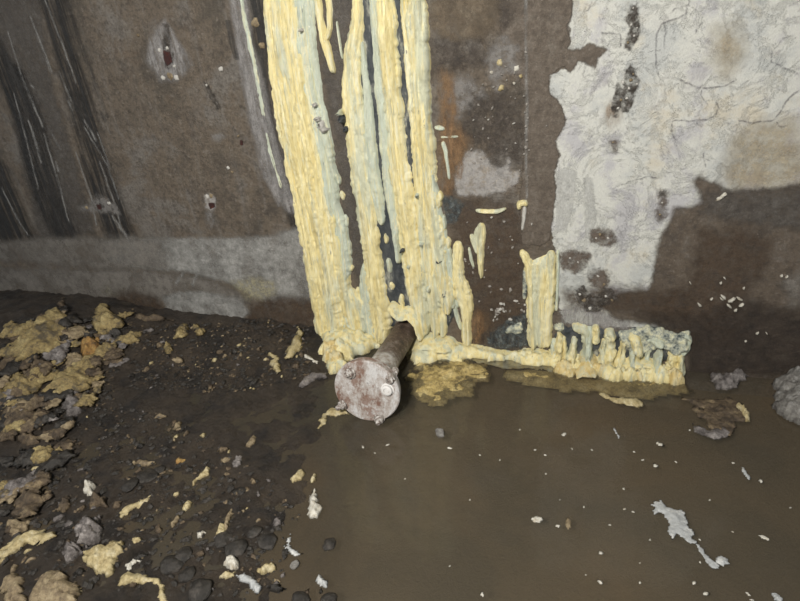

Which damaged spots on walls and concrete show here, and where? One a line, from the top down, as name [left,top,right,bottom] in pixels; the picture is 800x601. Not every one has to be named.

leakage [0,0,800,386]
flaking render [549,0,800,330]